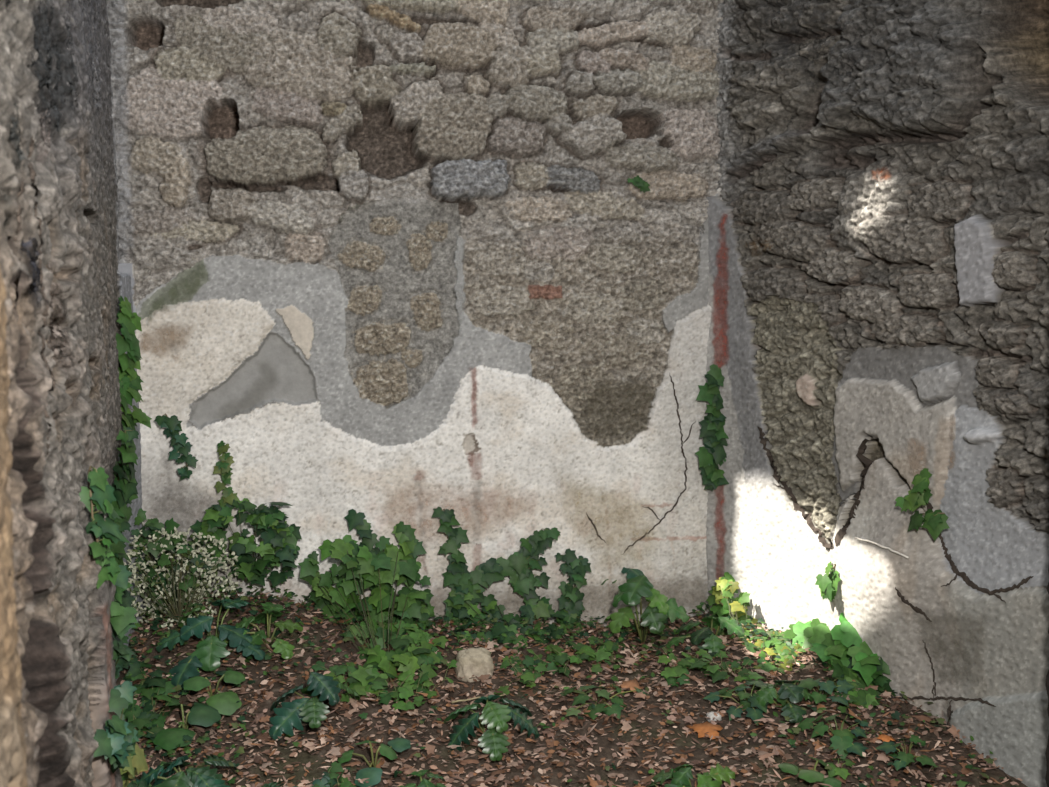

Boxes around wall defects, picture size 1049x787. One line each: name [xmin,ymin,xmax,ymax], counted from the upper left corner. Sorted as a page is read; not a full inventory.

damp [9,2,75,168]
rust [713,214,728,368]
flaking render [135,195,712,627]
crack [586,376,696,555]
rust [715,485,726,580]
spalling [748,295,961,540]
crack [938,533,1033,603]
crack [891,587,996,730]